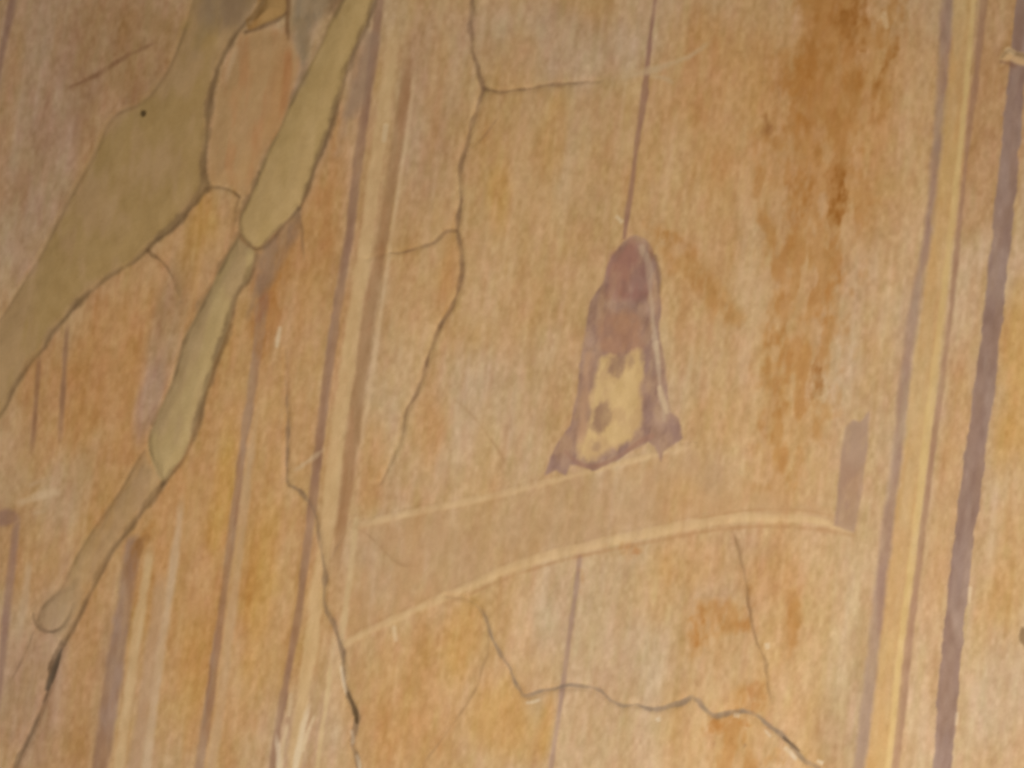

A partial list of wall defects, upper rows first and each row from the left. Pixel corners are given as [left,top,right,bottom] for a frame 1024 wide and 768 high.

crack [0,0,380,768]
crack [375,0,593,465]
crack [420,526,826,768]